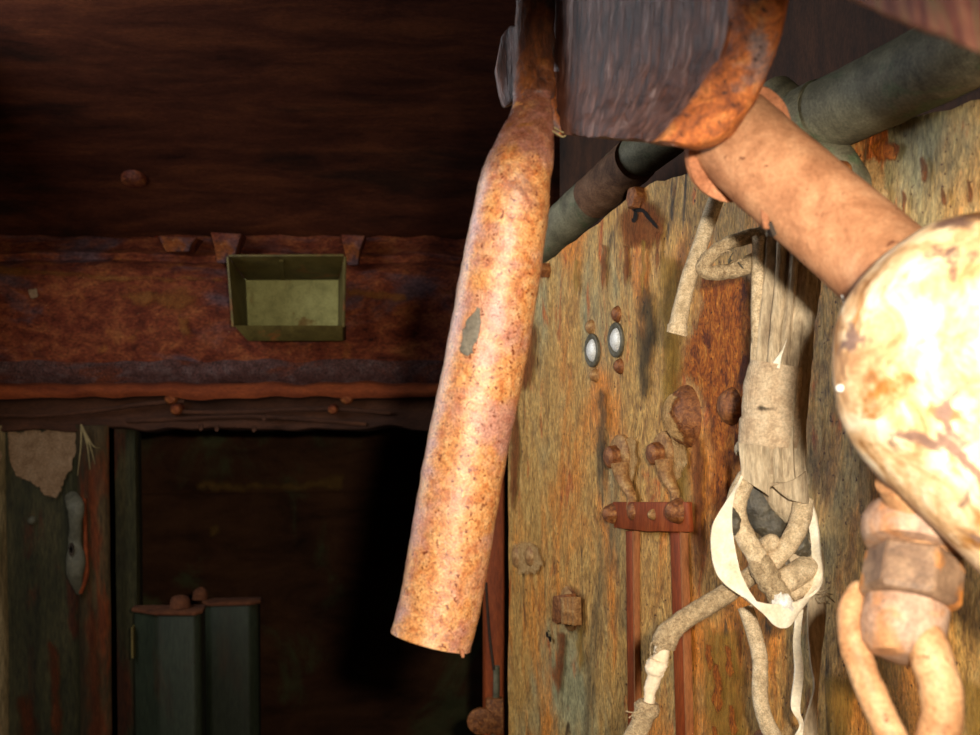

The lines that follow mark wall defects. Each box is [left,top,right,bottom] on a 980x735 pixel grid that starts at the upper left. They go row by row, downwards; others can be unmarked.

corrosion [521,329,536,390]
corrosion [619,201,751,569]
peeling [0,430,76,498]
corrosion [509,417,519,508]
corrosion [553,589,583,692]